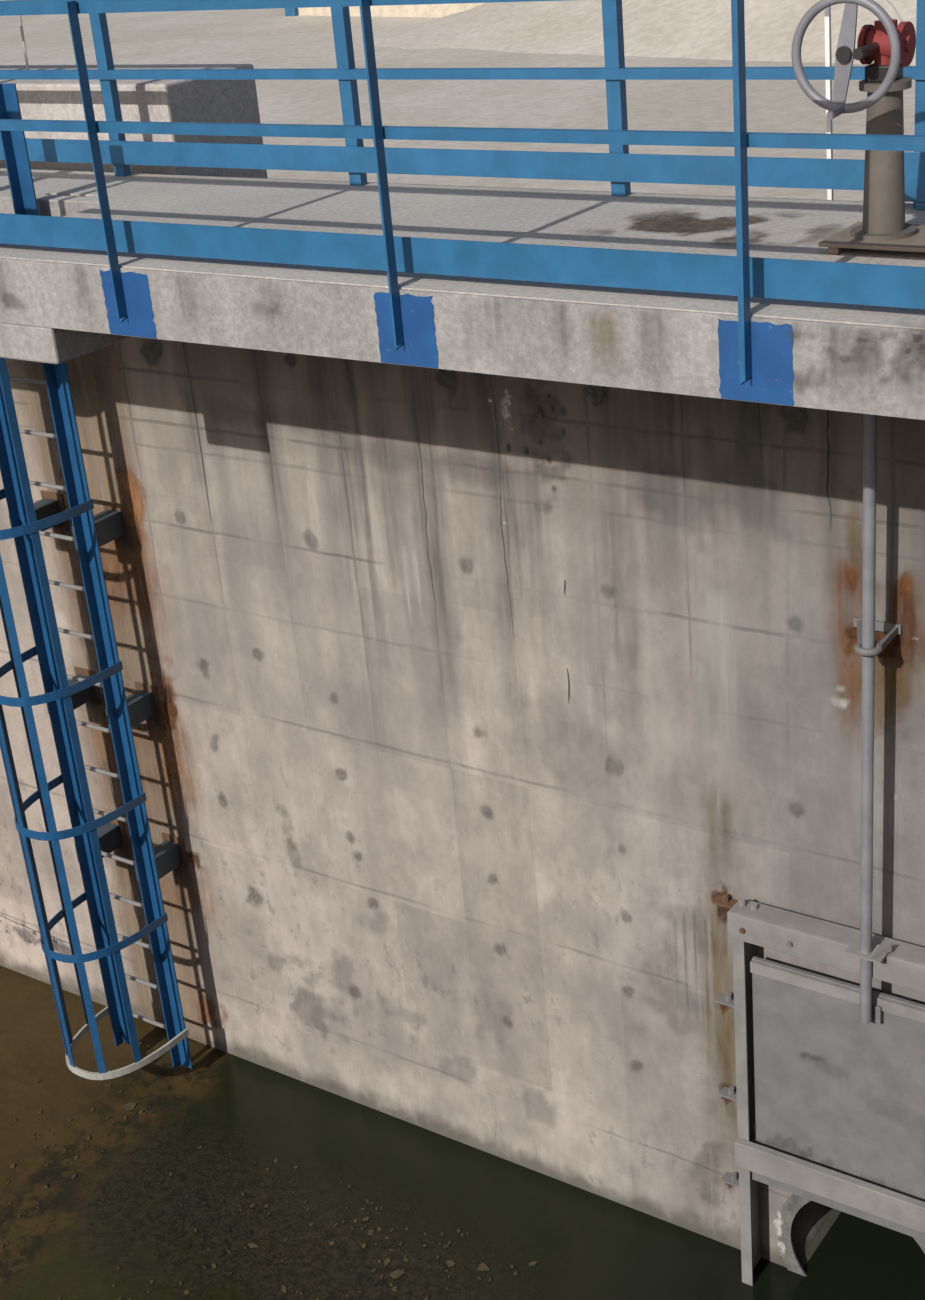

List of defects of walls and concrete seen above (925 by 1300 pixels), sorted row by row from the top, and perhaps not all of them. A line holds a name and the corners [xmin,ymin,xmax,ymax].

corrosion [25,360,67,495]
corrosion [66,344,184,848]
corrosion [842,627,860,706]
corrosion [875,576,925,695]
corrosion [55,524,165,1023]
corrosion [159,852,227,1032]